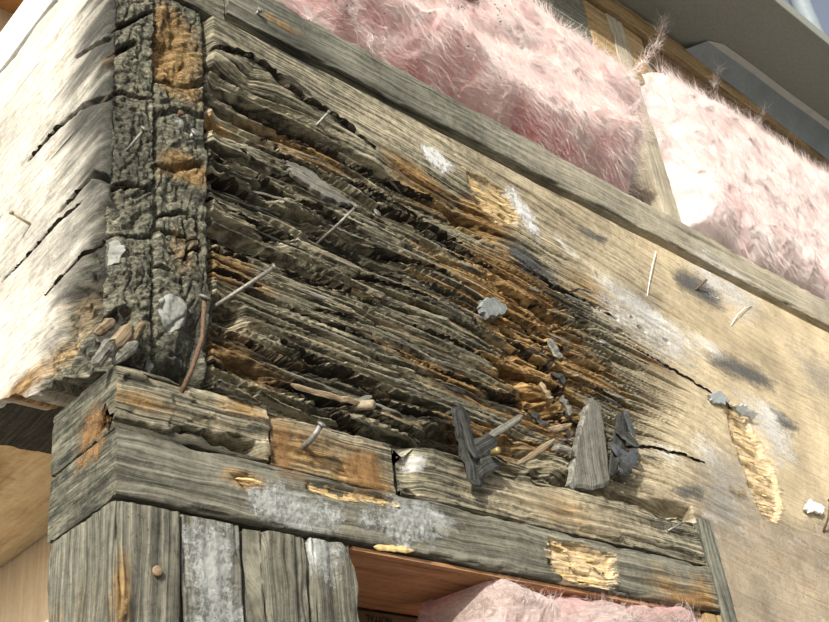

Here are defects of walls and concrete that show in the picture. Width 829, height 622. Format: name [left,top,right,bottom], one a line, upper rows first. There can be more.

crack [106,13,146,57]
crack [210,44,376,149]
crack [25,112,78,189]
crack [113,185,147,193]
crack [2,188,83,282]
crack [44,234,132,297]
crack [153,101,733,447]
leakage [675,271,720,305]
leakage [711,358,771,388]
crack [626,445,705,463]
peeling [551,543,612,583]